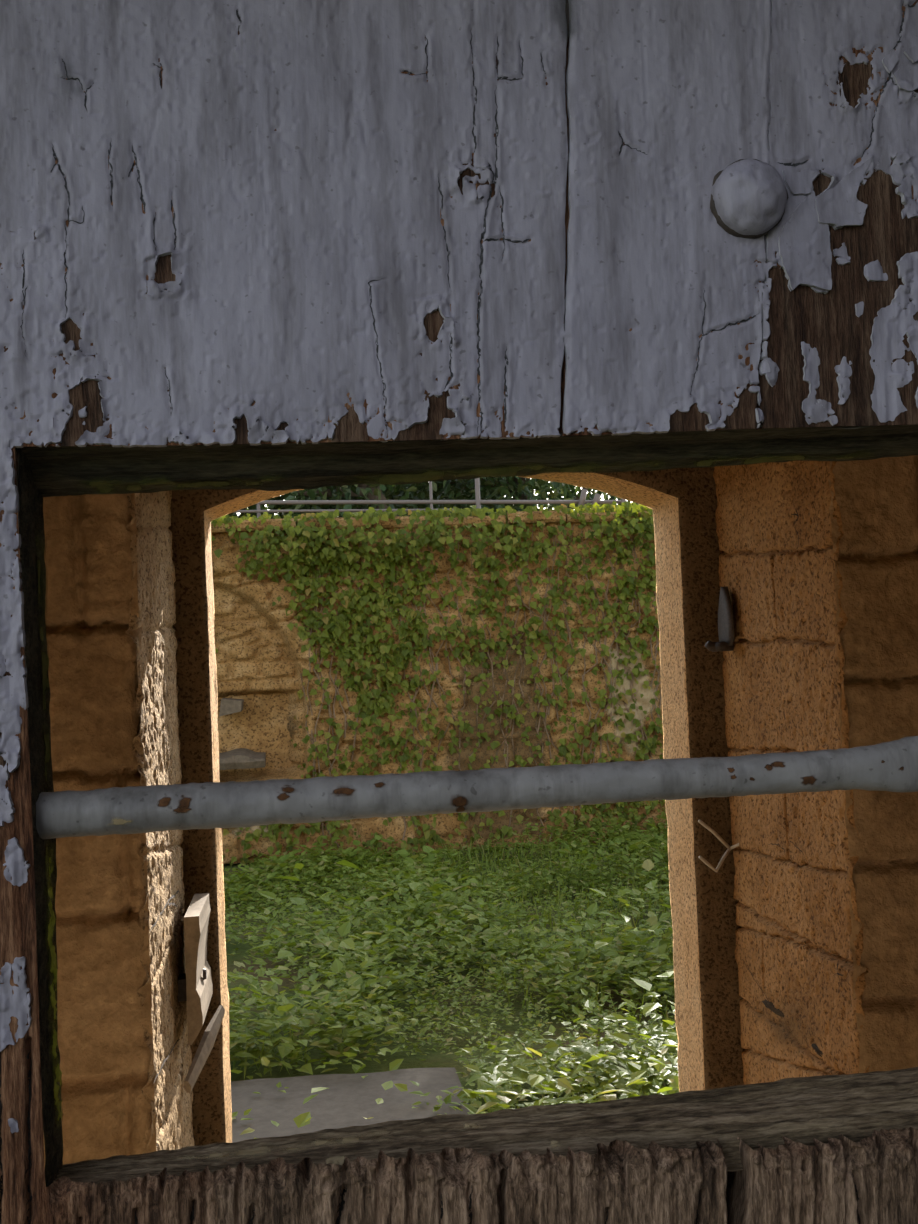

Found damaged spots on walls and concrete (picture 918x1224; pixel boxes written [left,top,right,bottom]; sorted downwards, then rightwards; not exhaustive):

peeling [836,61,872,108]
peeling [154,254,176,284]
peeling [668,156,918,432]
peeling [61,319,82,355]
peeling [424,309,444,342]
peeling [61,378,108,446]
peeling [331,406,369,442]
peeling [391,388,456,441]
rust [157,795,191,813]
rust [277,785,294,801]
rust [333,788,355,796]
peeling [0,708,918,1224]